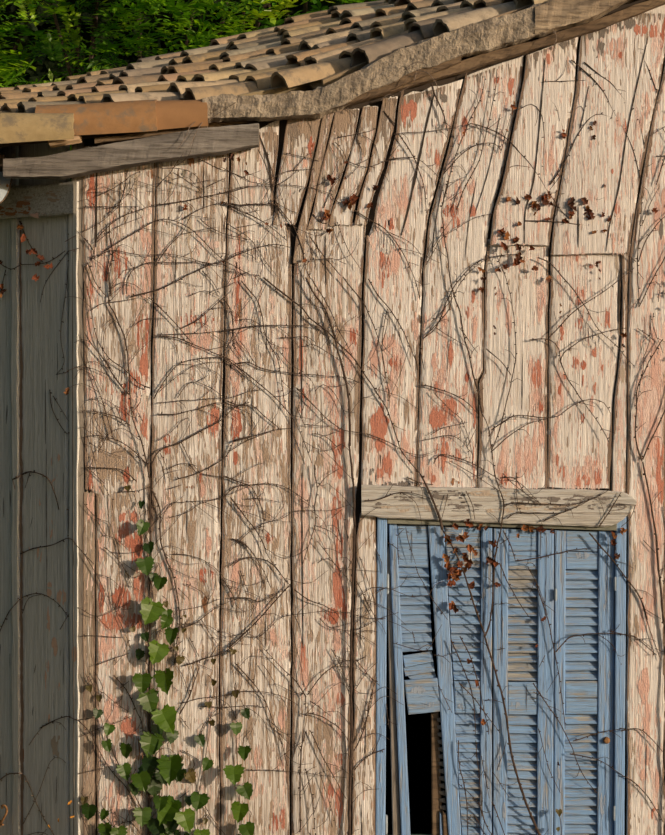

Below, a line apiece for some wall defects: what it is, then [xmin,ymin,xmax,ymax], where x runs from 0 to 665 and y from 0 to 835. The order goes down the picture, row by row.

peeling [72,65,529,835]
peeling [484,13,665,651]